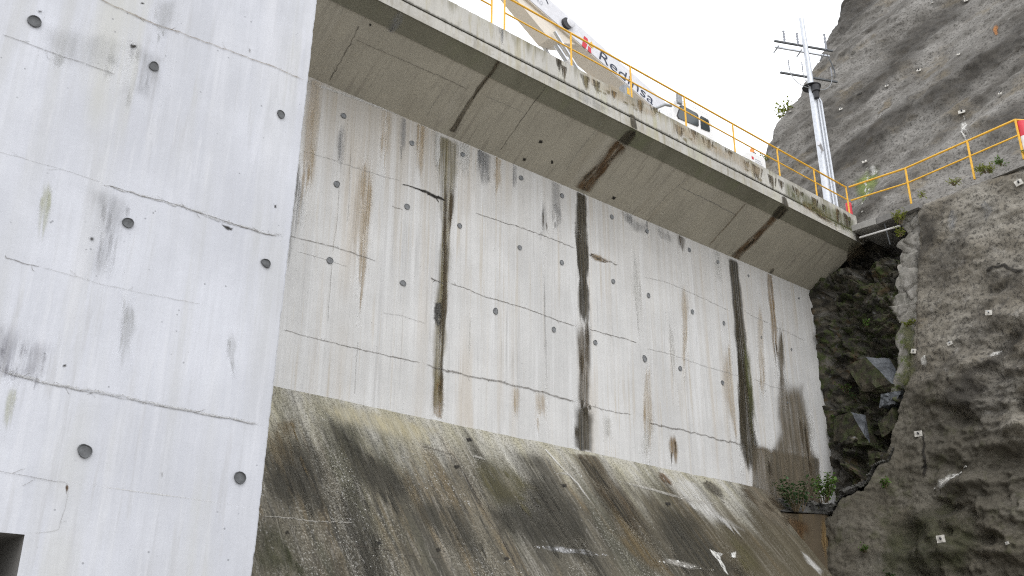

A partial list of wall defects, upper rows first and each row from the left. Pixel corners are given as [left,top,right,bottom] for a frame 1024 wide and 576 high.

damp [434,61,499,401]
damp [545,193,647,531]
damp [716,252,821,531]
damp [676,10,1023,260]